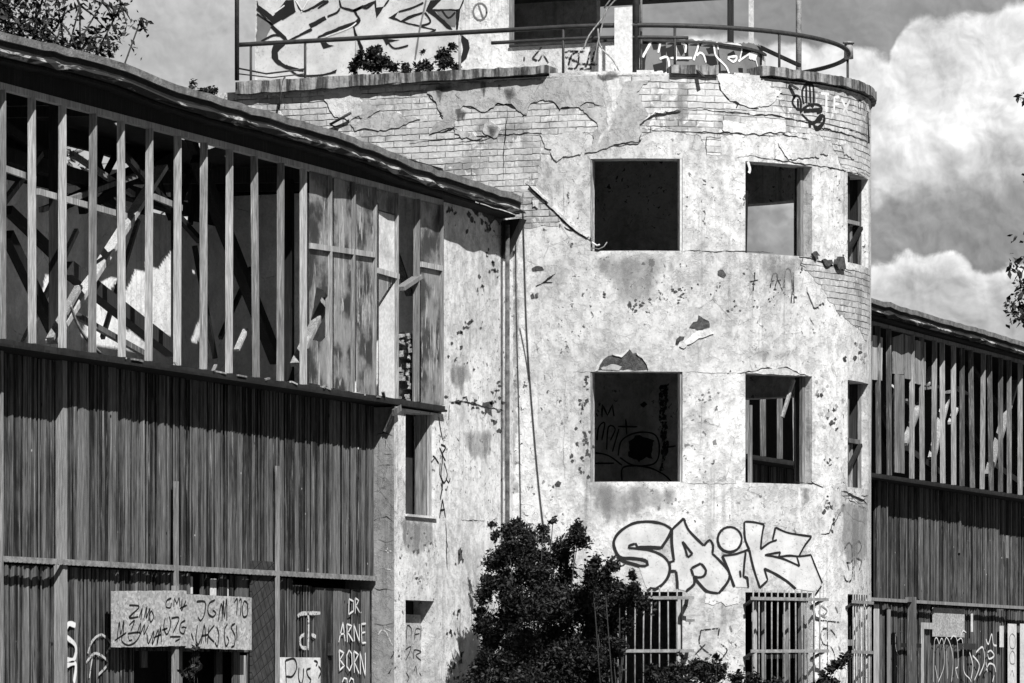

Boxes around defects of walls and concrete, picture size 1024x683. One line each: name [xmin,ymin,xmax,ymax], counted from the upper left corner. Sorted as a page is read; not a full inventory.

crack [409,94,591,241]
flaking render [229,74,870,234]
crack [613,83,865,177]
flaking render [675,315,714,348]
flaking render [727,251,871,364]
flaking render [570,349,649,479]
flaking render [812,374,844,433]